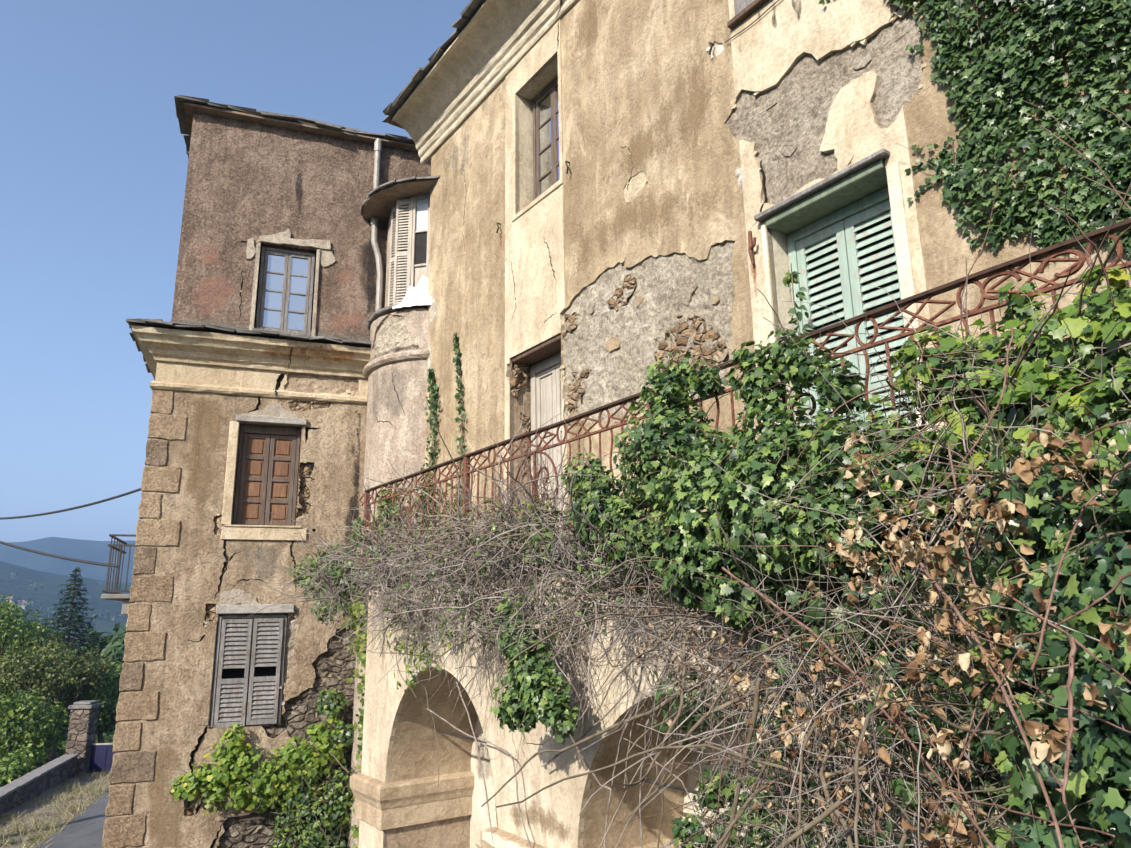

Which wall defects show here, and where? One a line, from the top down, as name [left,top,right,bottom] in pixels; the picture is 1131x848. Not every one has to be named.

spalling [726,9,926,205]
crack [247,347,293,413]
spalling [560,239,735,426]
spalling [296,463,314,519]
crack [189,540,296,642]
crack [187,725,222,848]
spalling [216,615,356,848]